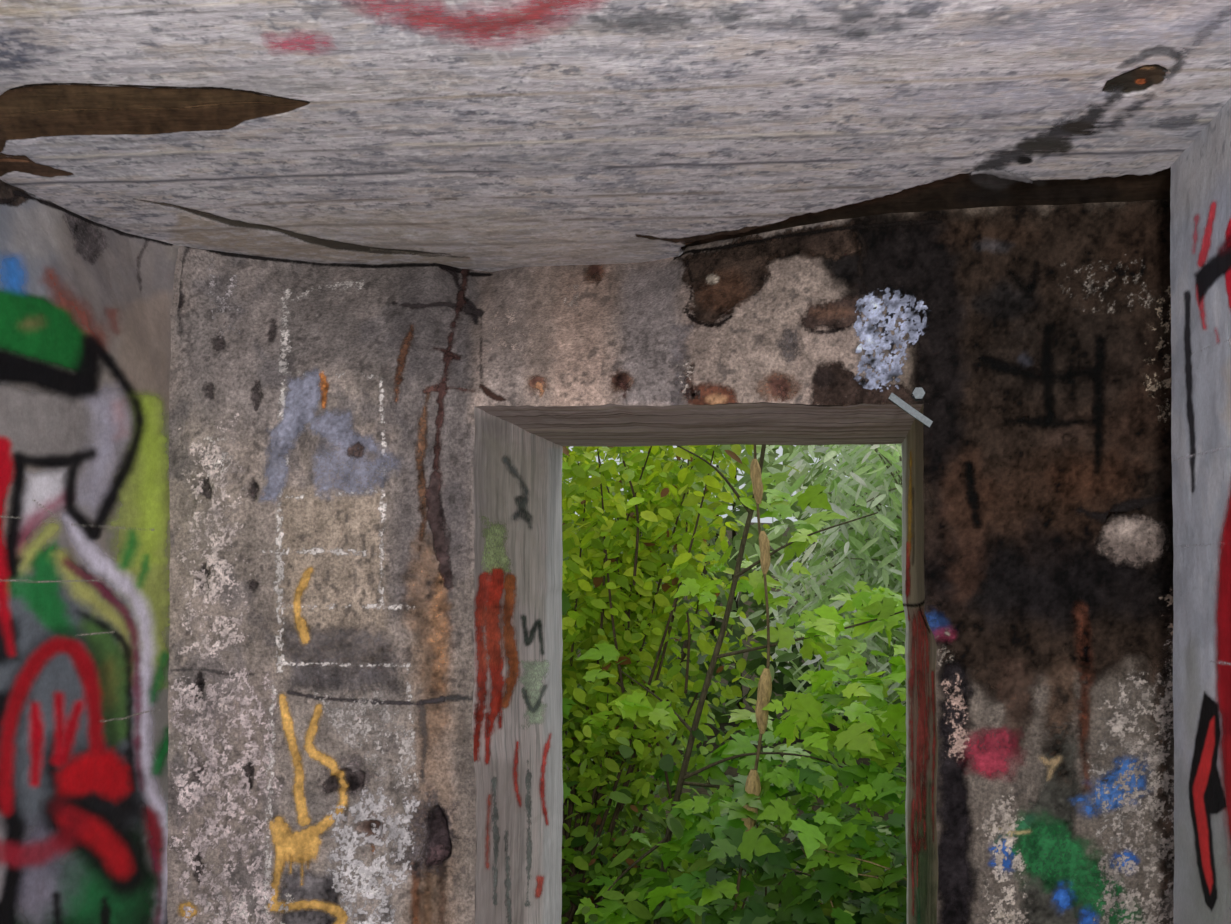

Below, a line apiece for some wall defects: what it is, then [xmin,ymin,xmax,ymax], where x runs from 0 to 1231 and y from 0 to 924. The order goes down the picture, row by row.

spalling [63,213,107,264]
spalling [0,83,310,207]
crack [13,190,506,401]
rust [320,372,329,408]
rust [394,325,414,402]
rust [410,269,475,712]
spalling [636,168,1172,423]
leakage [768,199,1175,924]
peeling [313,688,459,924]
rust [411,863,440,924]